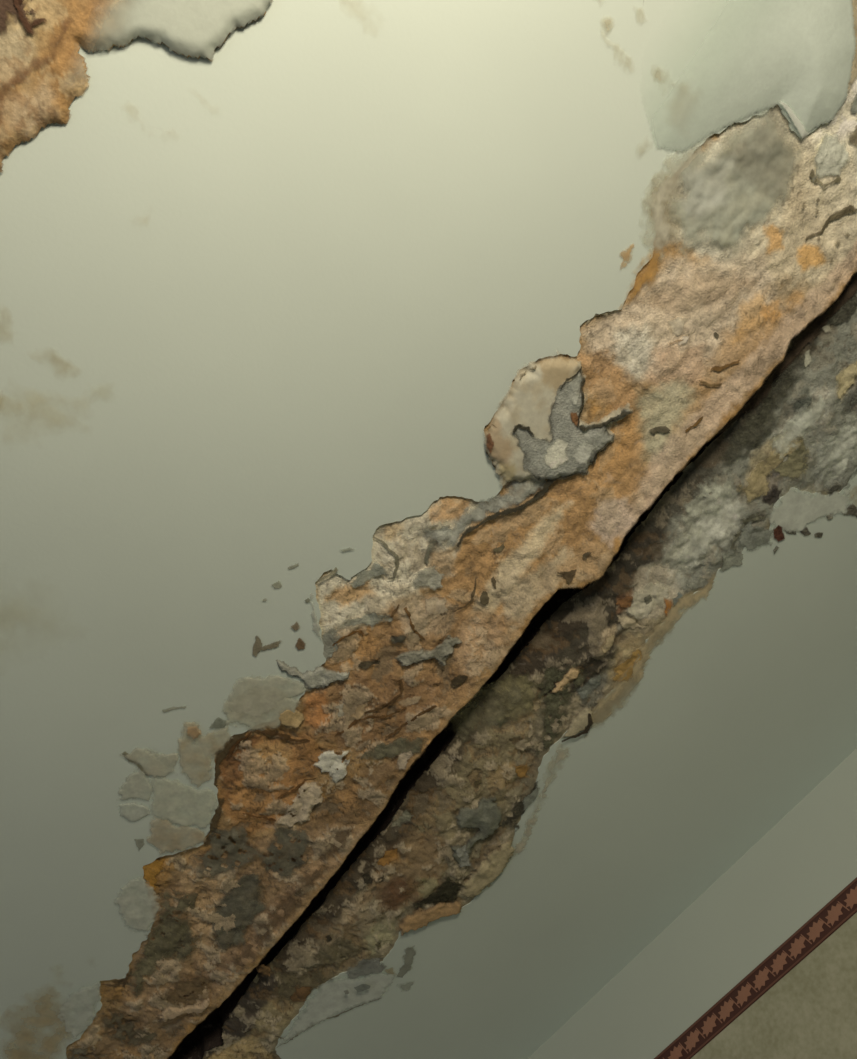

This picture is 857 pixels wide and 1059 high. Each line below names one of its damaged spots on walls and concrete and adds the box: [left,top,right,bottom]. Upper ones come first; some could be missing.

flaking render [0,0,266,173]
flaking render [621,244,634,266]
crack [167,275,857,1059]
flaking render [203,292,857,1059]
flaking render [119,749,178,800]